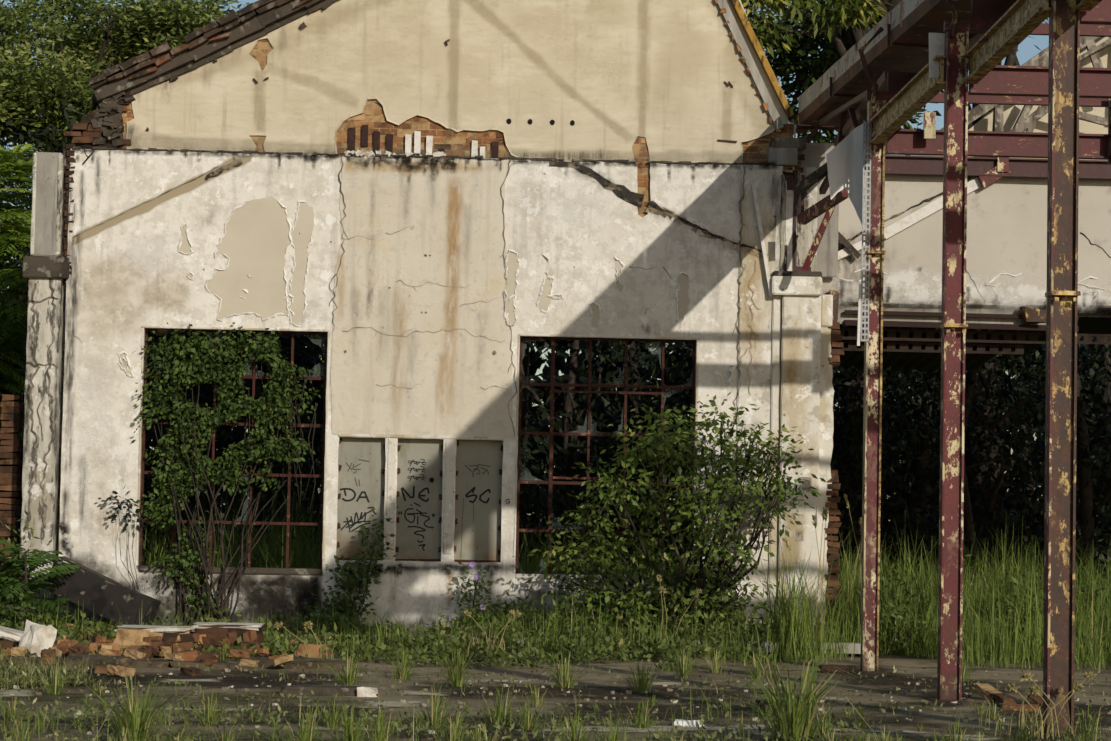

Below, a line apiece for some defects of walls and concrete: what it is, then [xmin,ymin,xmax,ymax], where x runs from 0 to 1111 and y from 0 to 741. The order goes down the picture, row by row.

spalling [250,39,273,71]
spalling [334,97,519,158]
spalling [632,136,650,217]
peeling [178,222,194,255]
peeling [187,196,314,327]
crack [329,153,525,436]
peeling [503,249,520,326]
peeling [536,252,564,314]
peeling [588,301,601,328]
peeling [613,256,625,292]
peeling [674,271,690,328]